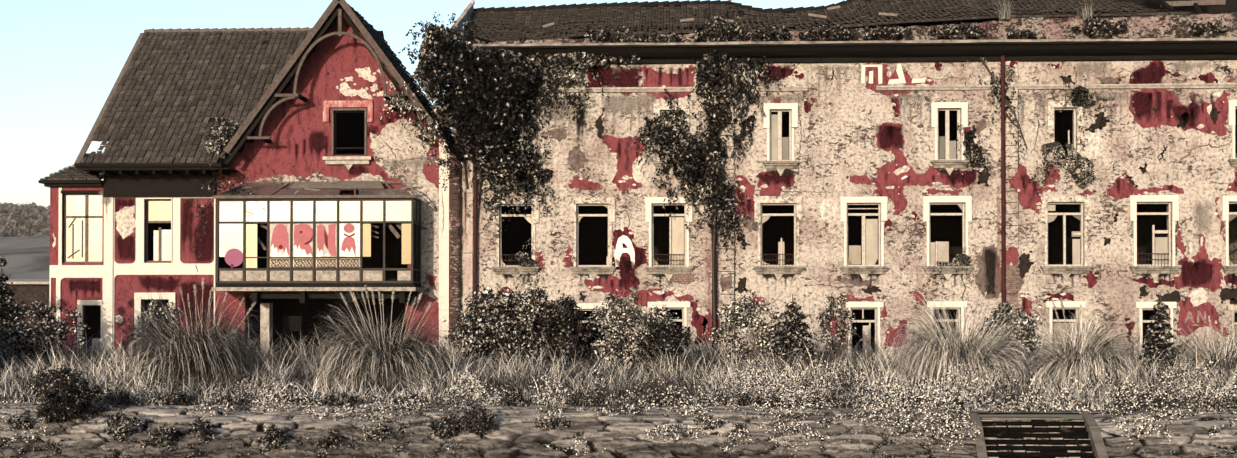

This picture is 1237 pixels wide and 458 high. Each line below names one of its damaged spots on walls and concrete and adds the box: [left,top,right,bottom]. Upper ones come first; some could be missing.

peeling [550,64,697,195]
peeling [846,62,991,231]
peeling [1084,60,1237,136]
spalling [115,205,136,239]
spalling [255,67,451,303]
peeling [535,250,546,270]
peeling [563,246,574,268]
peeling [579,227,720,345]
peeling [1005,164,1060,214]
peeling [1078,164,1184,222]
peeling [1132,223,1237,337]
peeling [1213,171,1237,241]